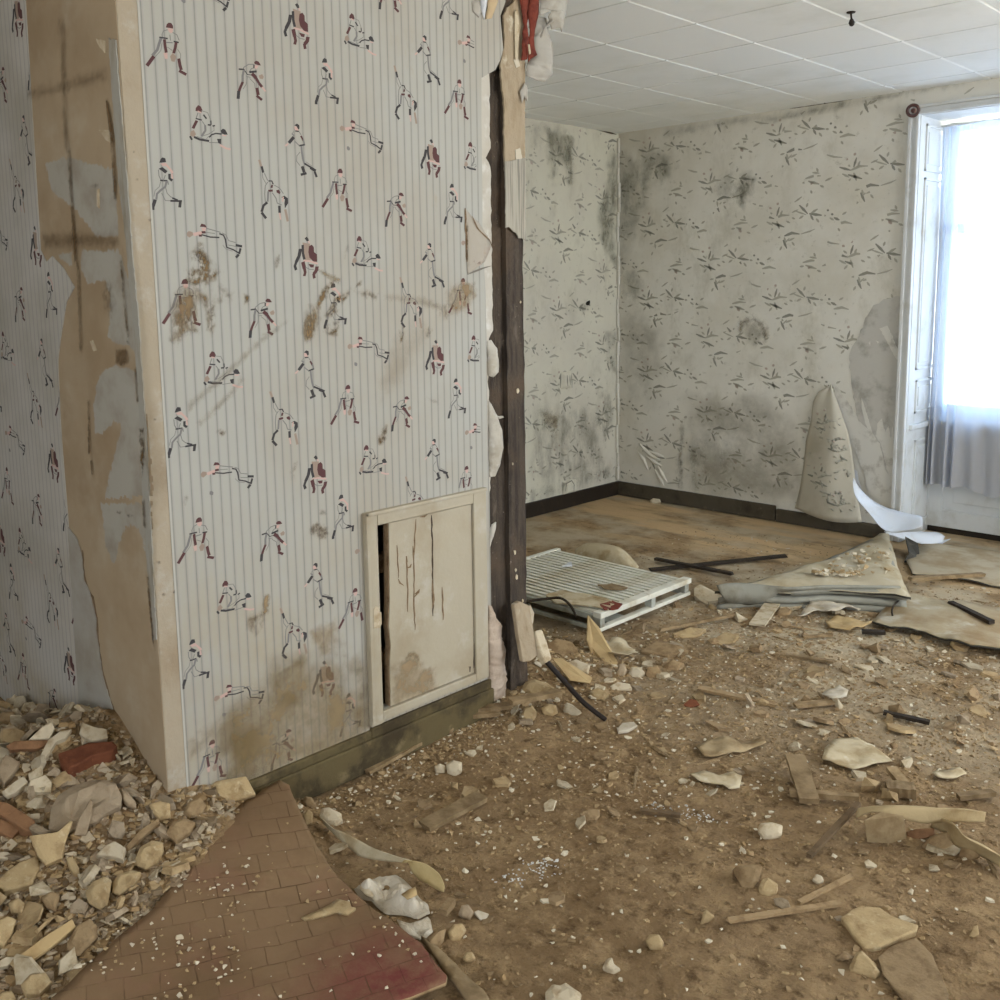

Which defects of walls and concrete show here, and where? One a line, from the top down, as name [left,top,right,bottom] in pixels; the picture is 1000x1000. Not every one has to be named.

peeling [513,0,539,68]
mould [549,132,572,162]
mould [602,179,628,259]
peeling [42,149,154,501]
leakage [175,251,217,337]
peeling [833,296,900,509]
leakage [225,665,348,775]